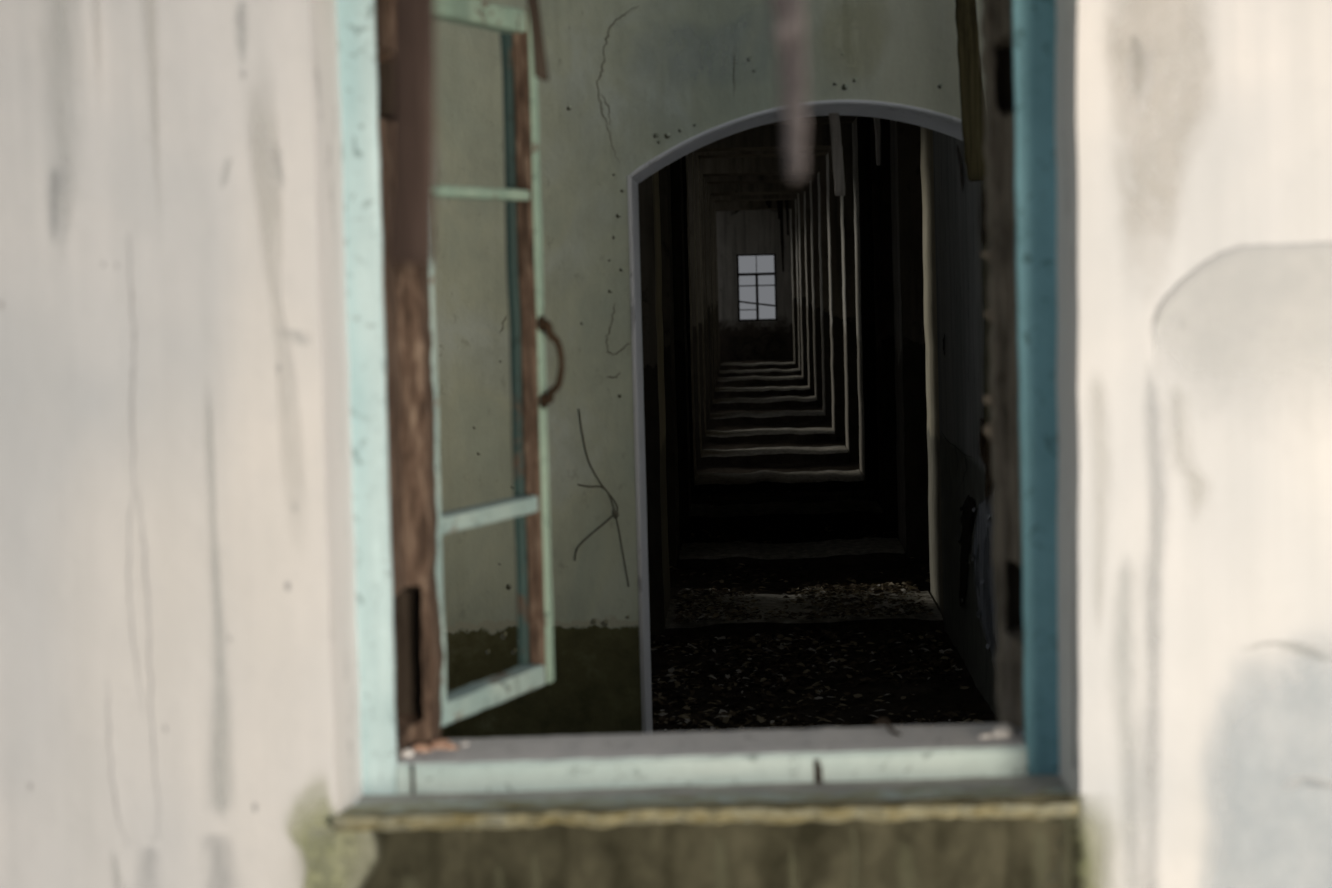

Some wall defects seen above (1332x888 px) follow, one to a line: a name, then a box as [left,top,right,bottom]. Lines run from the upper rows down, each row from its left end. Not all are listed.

crack [596,6,639,163]
water stain [361,794,1083,888]